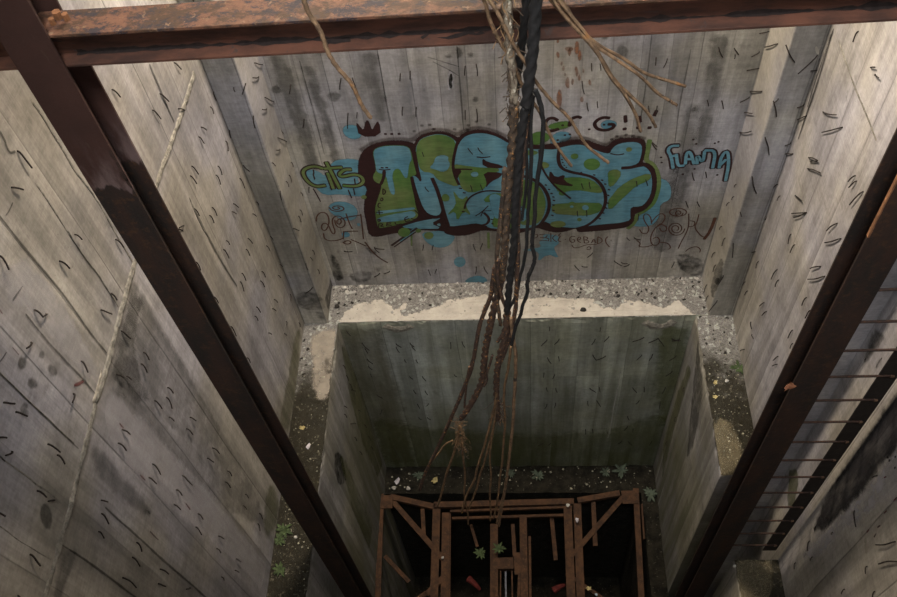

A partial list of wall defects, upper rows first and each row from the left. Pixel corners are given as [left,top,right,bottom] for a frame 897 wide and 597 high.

rust [540,1,897,27]
rust [76,25,520,55]
rust [556,40,591,106]
damp [865,331,882,359]
damp [814,393,897,531]